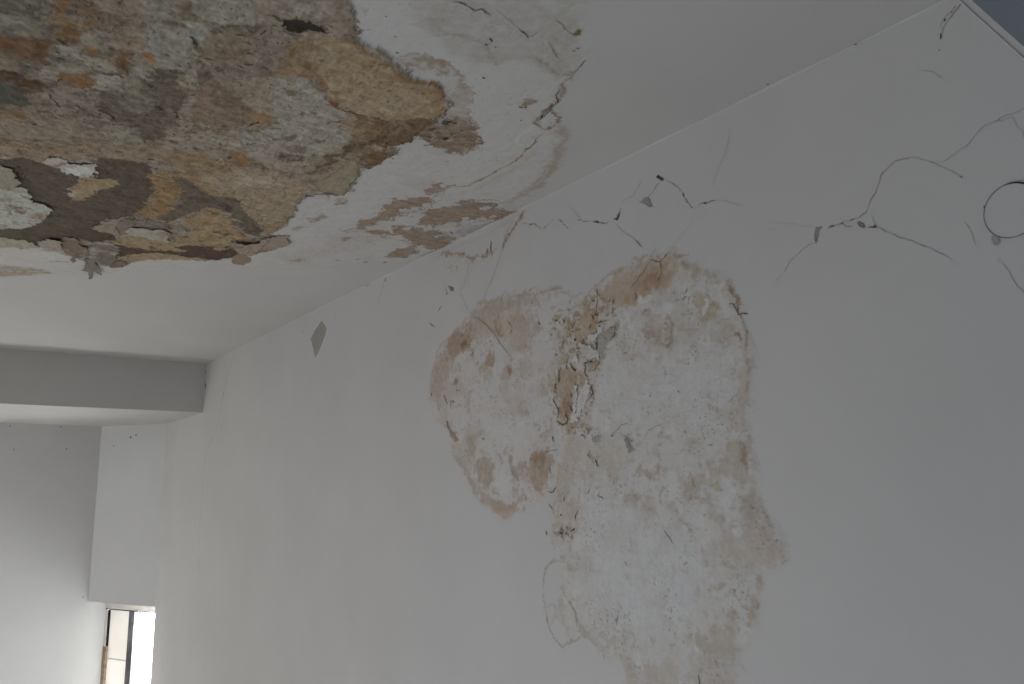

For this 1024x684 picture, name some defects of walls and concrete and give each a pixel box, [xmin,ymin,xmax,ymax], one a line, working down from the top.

peeling [0,0,525,280]
leakage [350,0,600,205]
crack [453,2,586,120]
crack [524,127,742,246]
crack [763,108,1024,278]
spalling [547,287,623,443]
leakage [428,245,794,684]